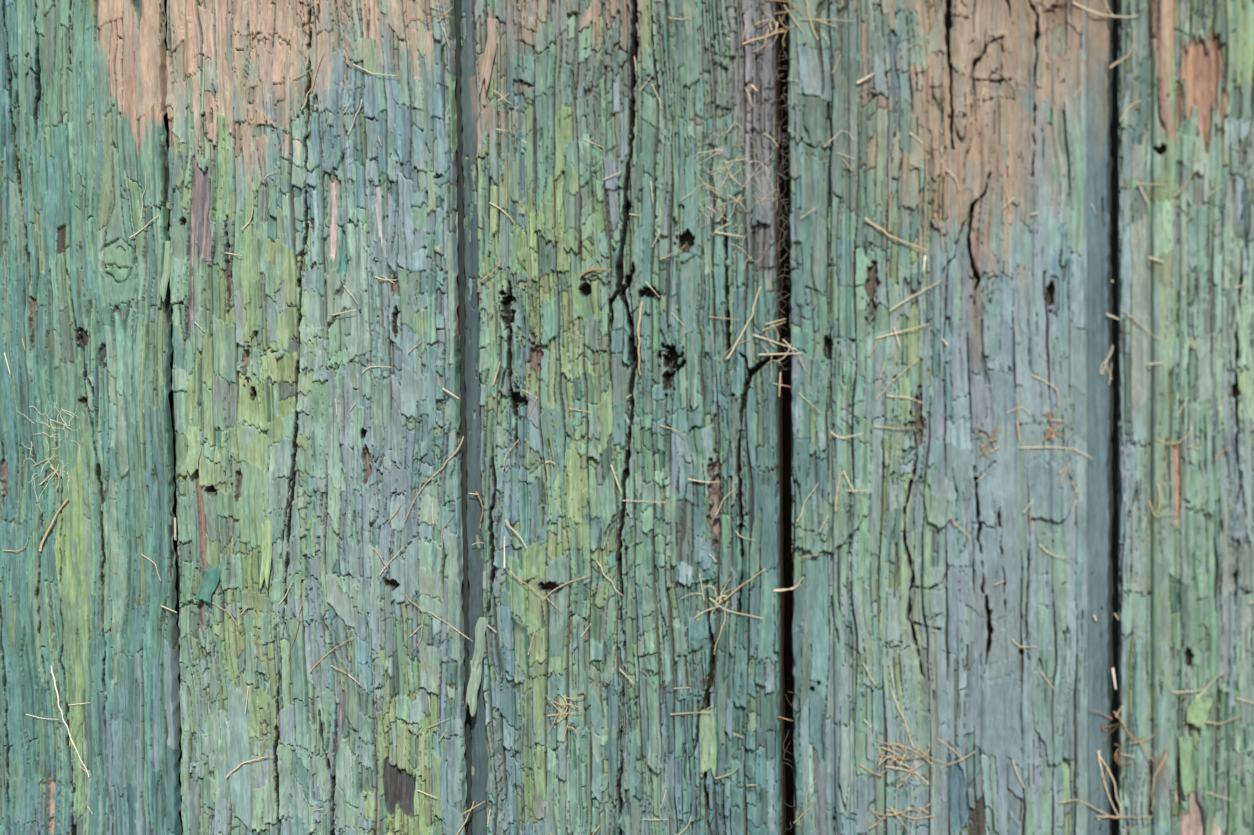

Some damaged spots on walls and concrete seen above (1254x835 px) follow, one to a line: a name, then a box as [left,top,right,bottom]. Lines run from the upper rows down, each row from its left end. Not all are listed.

peeling [97,0,454,341]
peeling [534,162,583,255]
peeling [470,0,657,157]
peeling [603,156,621,237]
peeling [871,0,1092,280]
peeling [1151,0,1229,155]
crack [609,0,639,835]
crack [694,203,779,835]
peeling [1175,693,1254,835]